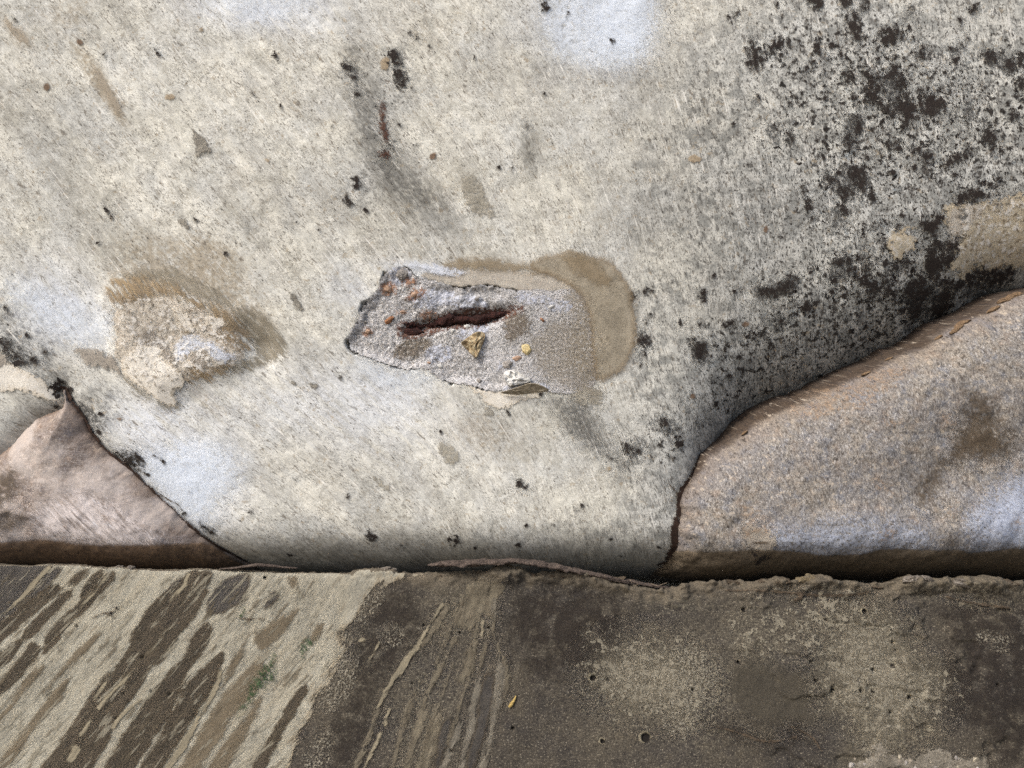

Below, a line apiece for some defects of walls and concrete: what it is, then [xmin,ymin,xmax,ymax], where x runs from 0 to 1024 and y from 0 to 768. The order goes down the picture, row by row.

water stain [678,0,1024,416]
spalling [347,267,596,417]
water stain [405,249,654,408]
water stain [0,442,299,768]
water stain [251,684,308,768]
water stain [310,623,324,642]
water stain [333,579,510,768]
water stain [511,585,618,675]
water stain [945,602,1024,761]